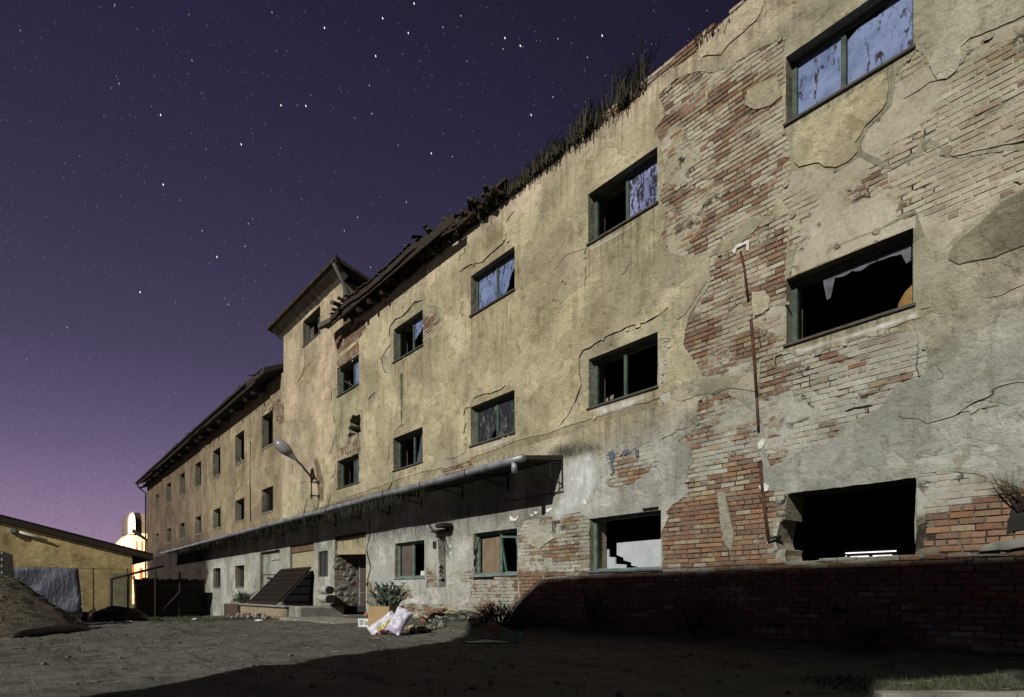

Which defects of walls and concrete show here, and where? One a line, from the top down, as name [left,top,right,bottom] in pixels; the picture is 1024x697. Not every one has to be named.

crack [459,210,515,318]
flaking render [333,320,367,371]
crack [559,307,668,426]
flaking render [346,0,1024,654]
crack [897,381,1024,424]